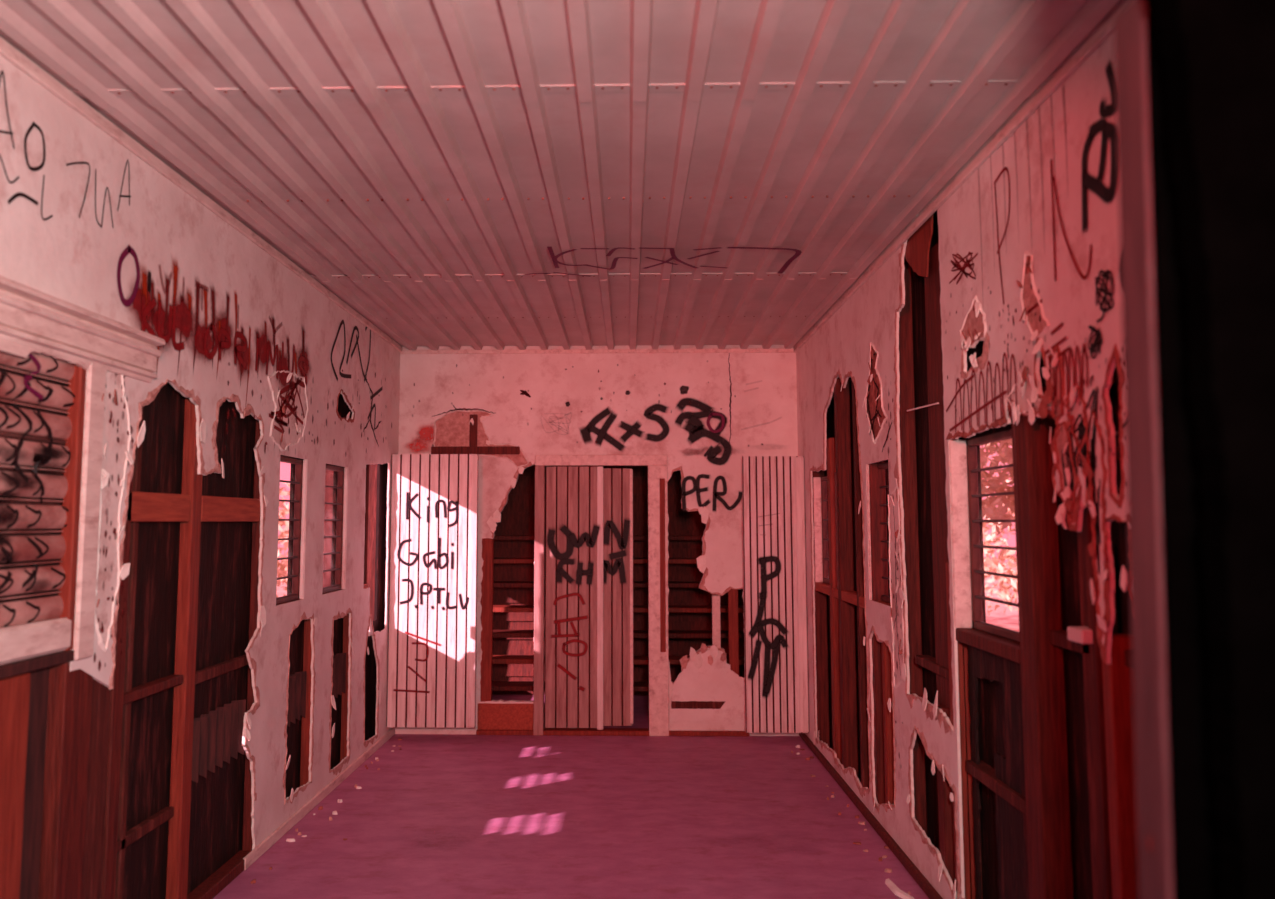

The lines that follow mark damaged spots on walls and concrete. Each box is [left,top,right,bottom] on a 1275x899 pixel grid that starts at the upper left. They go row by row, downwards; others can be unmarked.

peeling [95,370,308,801]
flaking render [283,608,381,804]
peeling [431,410,532,538]
peeling [679,643,727,670]
flaking render [671,466,744,617]
peeling [810,244,961,899]
flaking render [946,251,1131,664]